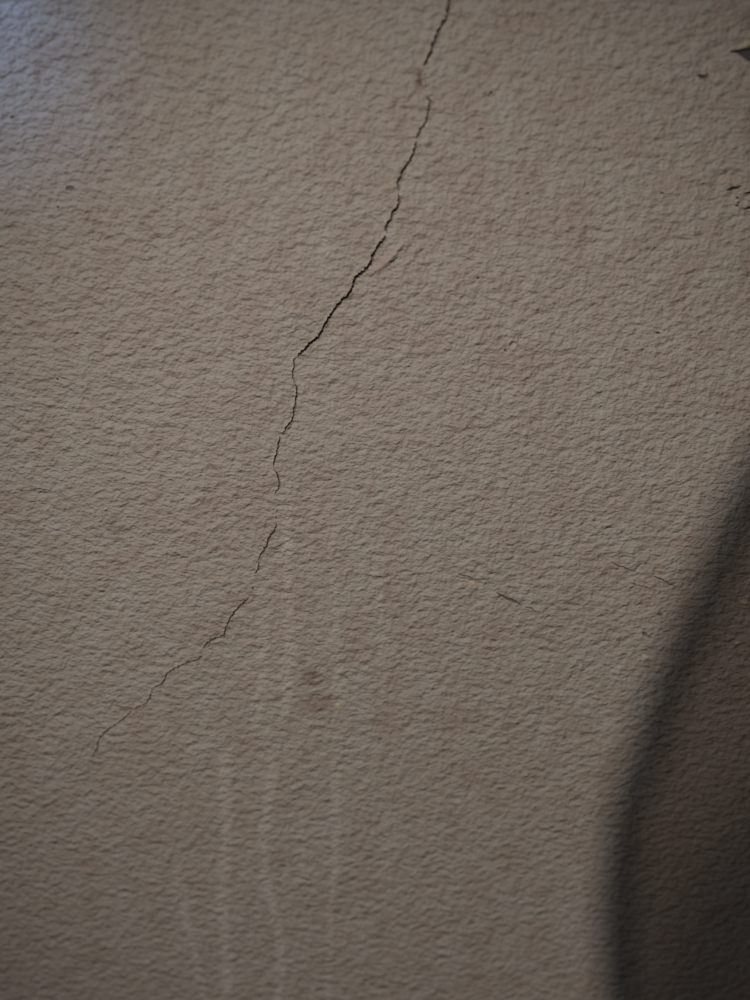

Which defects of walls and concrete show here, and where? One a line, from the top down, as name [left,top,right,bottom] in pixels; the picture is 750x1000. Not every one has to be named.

crack [91,0,453,759]